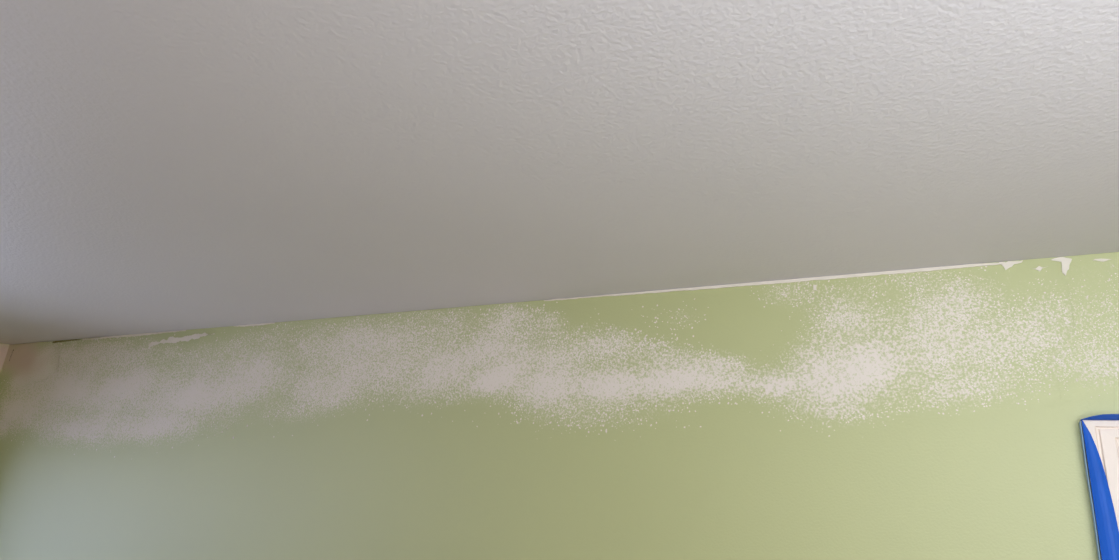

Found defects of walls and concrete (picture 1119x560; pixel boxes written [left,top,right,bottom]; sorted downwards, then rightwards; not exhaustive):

water stain [0,340,302,453]
water stain [377,319,927,421]